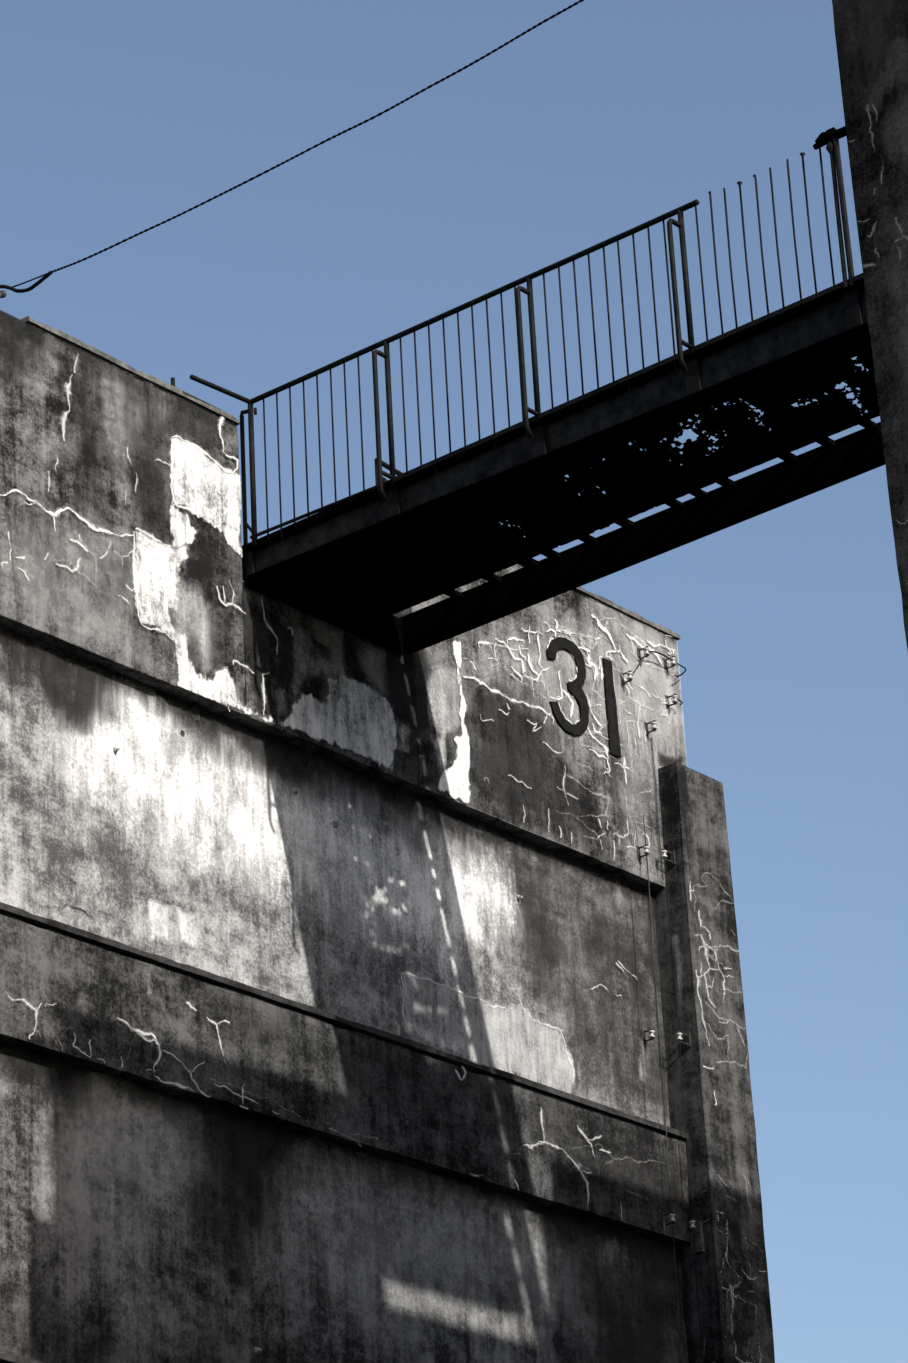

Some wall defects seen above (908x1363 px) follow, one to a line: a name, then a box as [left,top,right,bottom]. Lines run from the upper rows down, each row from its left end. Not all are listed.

crack [0,359,137,604]
peeling [132,435,397,769]
peeling [438,641,470,803]
crack [463,614,675,784]
crack [11,998,54,1039]
crack [73,1002,279,1114]
peeling [401,973,575,1094]
damp [0,1043,690,1363]
crack [523,1107,591,1206]